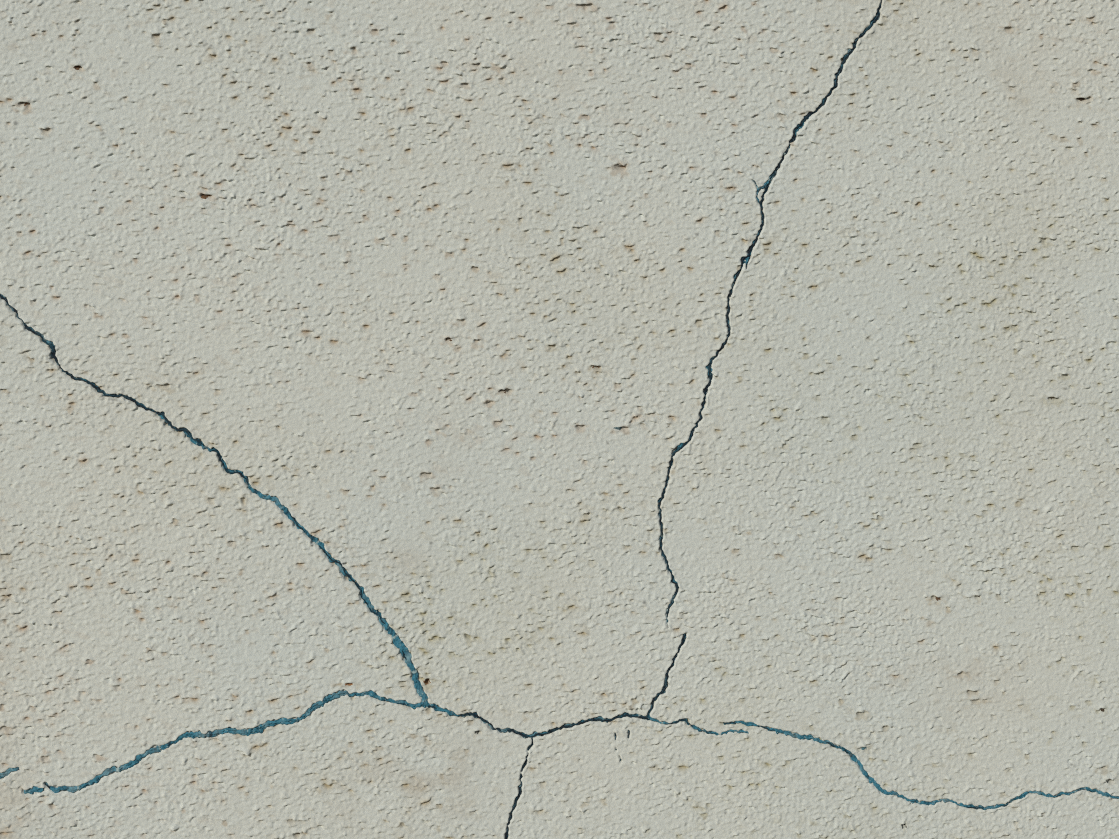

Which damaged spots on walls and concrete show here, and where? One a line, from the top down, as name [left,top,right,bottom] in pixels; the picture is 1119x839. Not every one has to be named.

crack [0,294,1119,839]
crack [658,0,882,628]